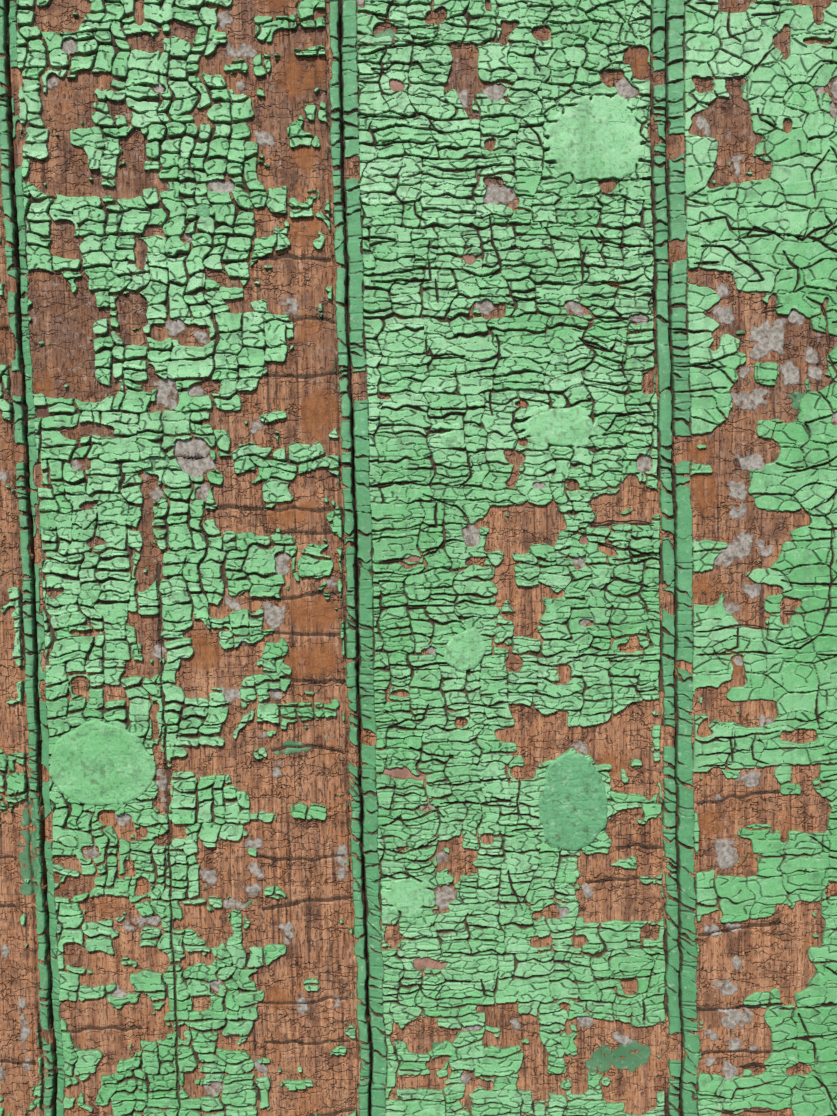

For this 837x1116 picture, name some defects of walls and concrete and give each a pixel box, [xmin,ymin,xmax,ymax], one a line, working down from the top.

peeling [593,44,665,99]
peeling [642,69,795,192]
crack [579,232,711,378]
crack [695,148,837,398]
crack [425,336,520,440]
peeling [0,0,447,1116]
crack [369,451,472,563]
crack [699,490,837,657]
peeling [449,710,474,732]
crack [350,702,534,898]
peeling [390,827,500,913]
peeling [385,881,837,1116]